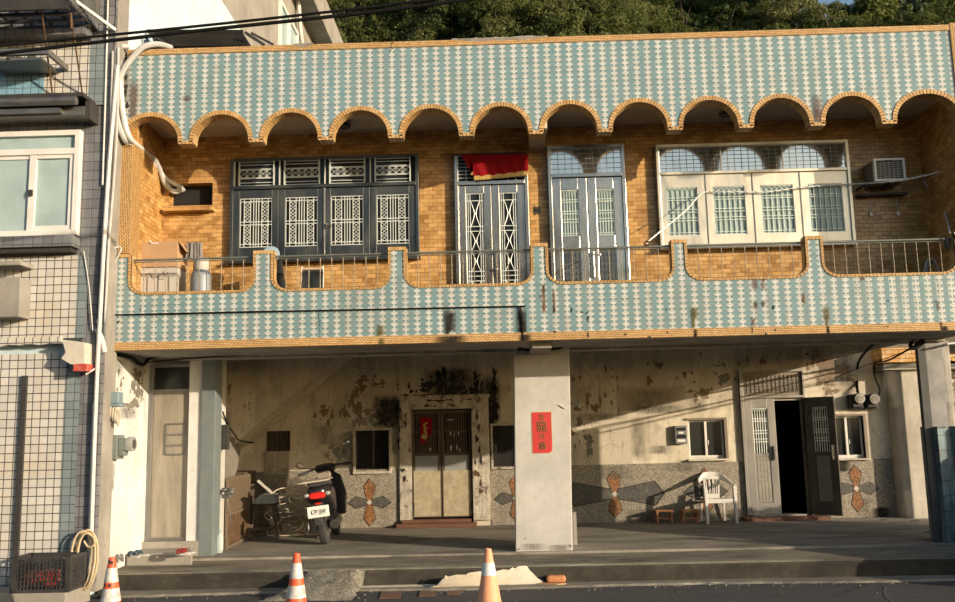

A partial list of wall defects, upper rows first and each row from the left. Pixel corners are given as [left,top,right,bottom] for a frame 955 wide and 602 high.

peeling [116,368,146,413]
water stain [374,396,399,427]
spalling [311,364,506,494]
water stain [429,369,499,437]
peeling [571,362,620,460]
peeling [674,350,781,408]